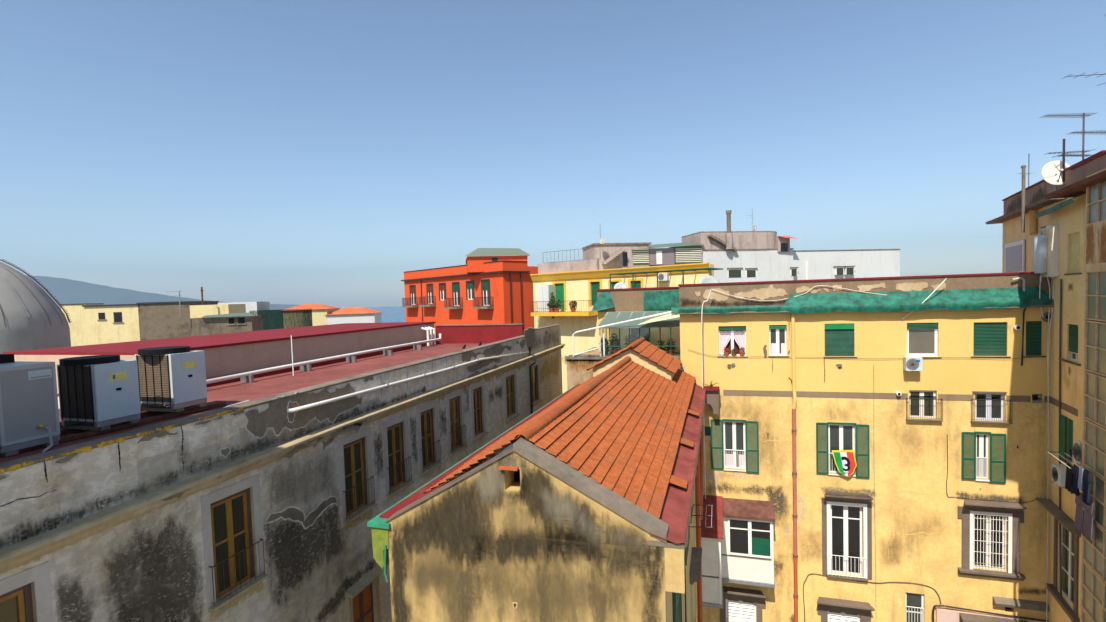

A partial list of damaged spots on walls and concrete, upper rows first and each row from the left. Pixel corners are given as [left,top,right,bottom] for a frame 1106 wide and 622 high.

peeling [694,284,843,302]
peeling [857,281,947,292]
crack [0,462,57,507]
peeling [264,495,338,529]
leakage [704,473,787,524]
mould [58,581,92,622]
mould [108,522,202,622]
leakage [266,506,343,604]
leakage [318,562,374,621]
leakage [392,454,663,622]